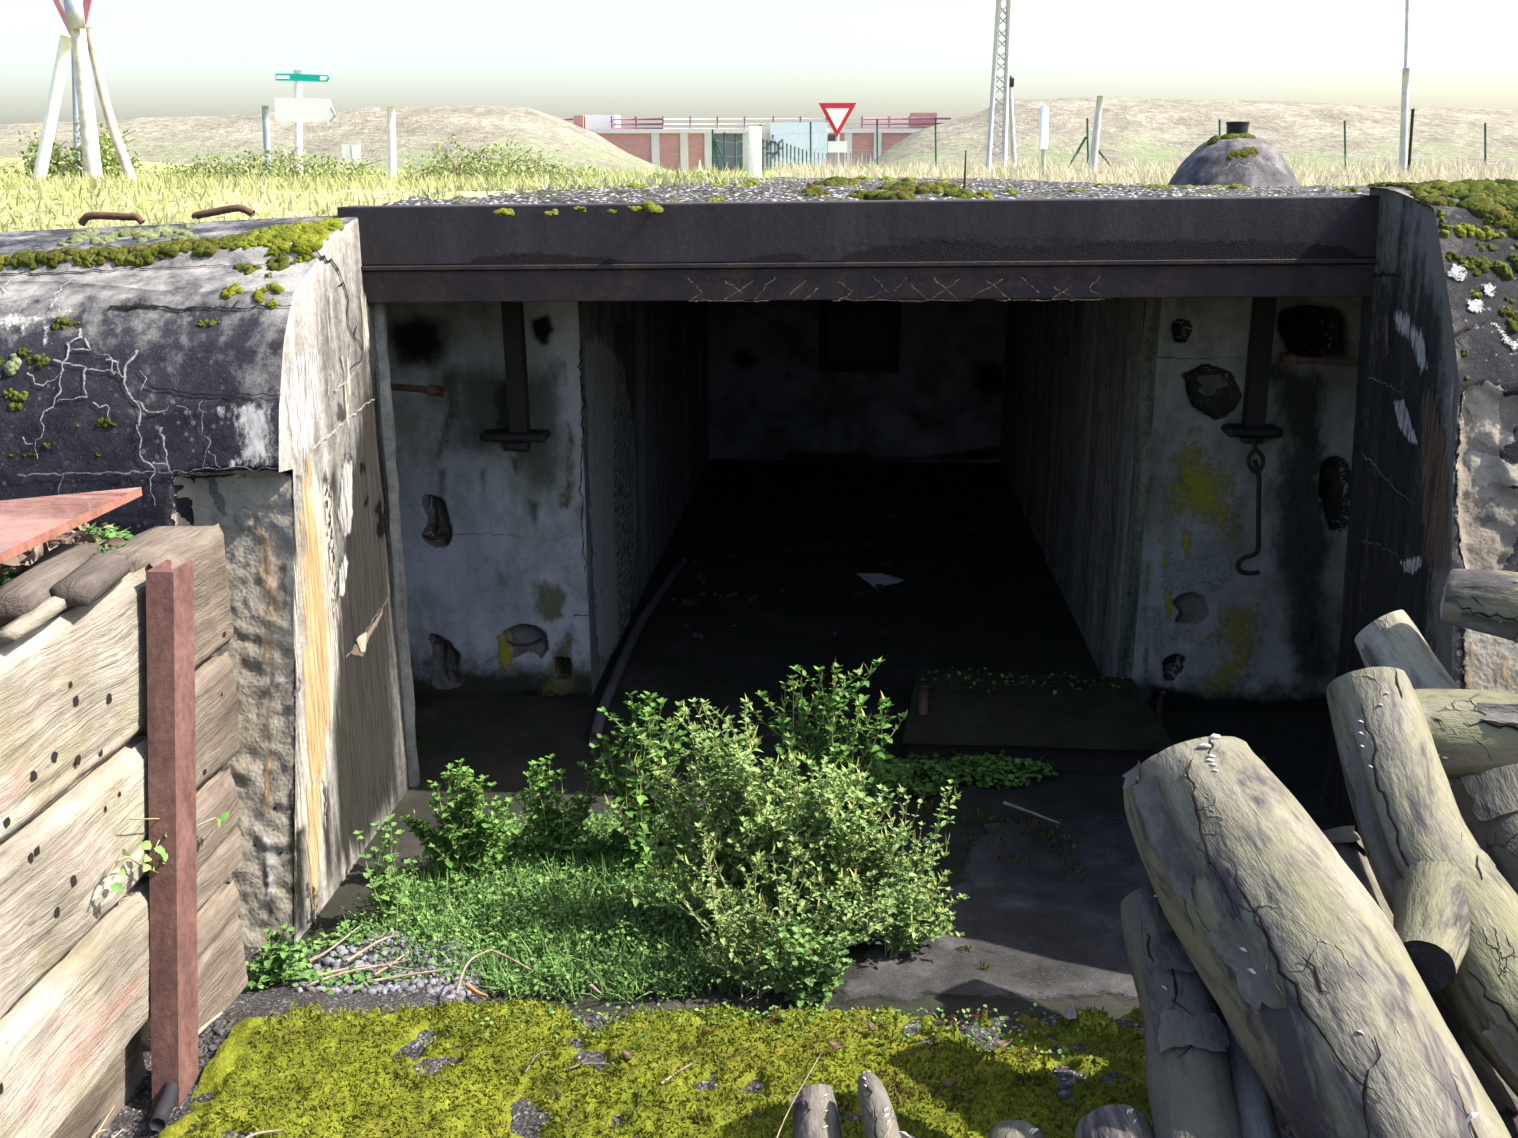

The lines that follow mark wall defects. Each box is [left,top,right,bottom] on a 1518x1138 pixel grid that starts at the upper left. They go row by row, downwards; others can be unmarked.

corrosion [466,252,646,271]
corrosion [687,277,775,302]
corrosion [833,274,1105,302]
leakage [391,316,443,365]
leakage [532,316,553,345]
crack [0,249,377,505]
spalling [1183,363,1242,420]
leakage [439,324,654,664]
spalling [1455,380,1518,570]
spalling [503,624,572,680]
leakage [1149,607,1329,713]
spalling [171,470,295,949]